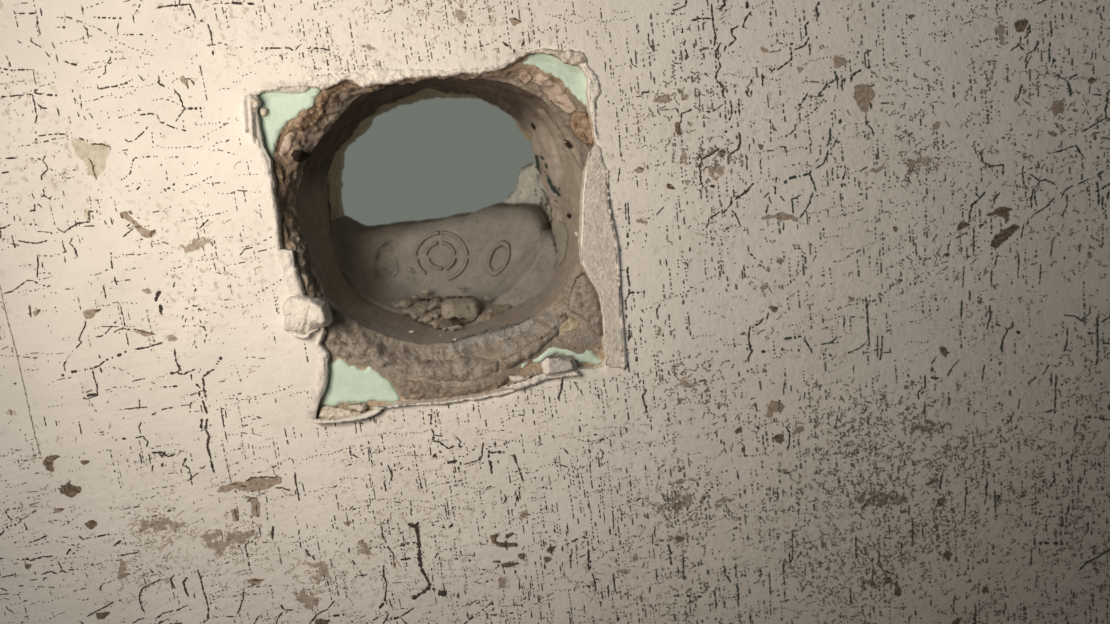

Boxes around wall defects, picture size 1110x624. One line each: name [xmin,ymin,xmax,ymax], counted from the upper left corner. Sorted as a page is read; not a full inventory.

crack [255,0,635,77]
peeling [72,137,111,179]
crack [0,0,284,351]
peeling [119,211,156,238]
spalling [272,53,605,424]
crack [659,196,694,247]
peeling [986,206,1019,248]
crack [1,277,145,412]
crack [119,400,173,419]
crack [0,429,42,470]
peeling [43,455,59,472]
peeling [201,475,290,556]